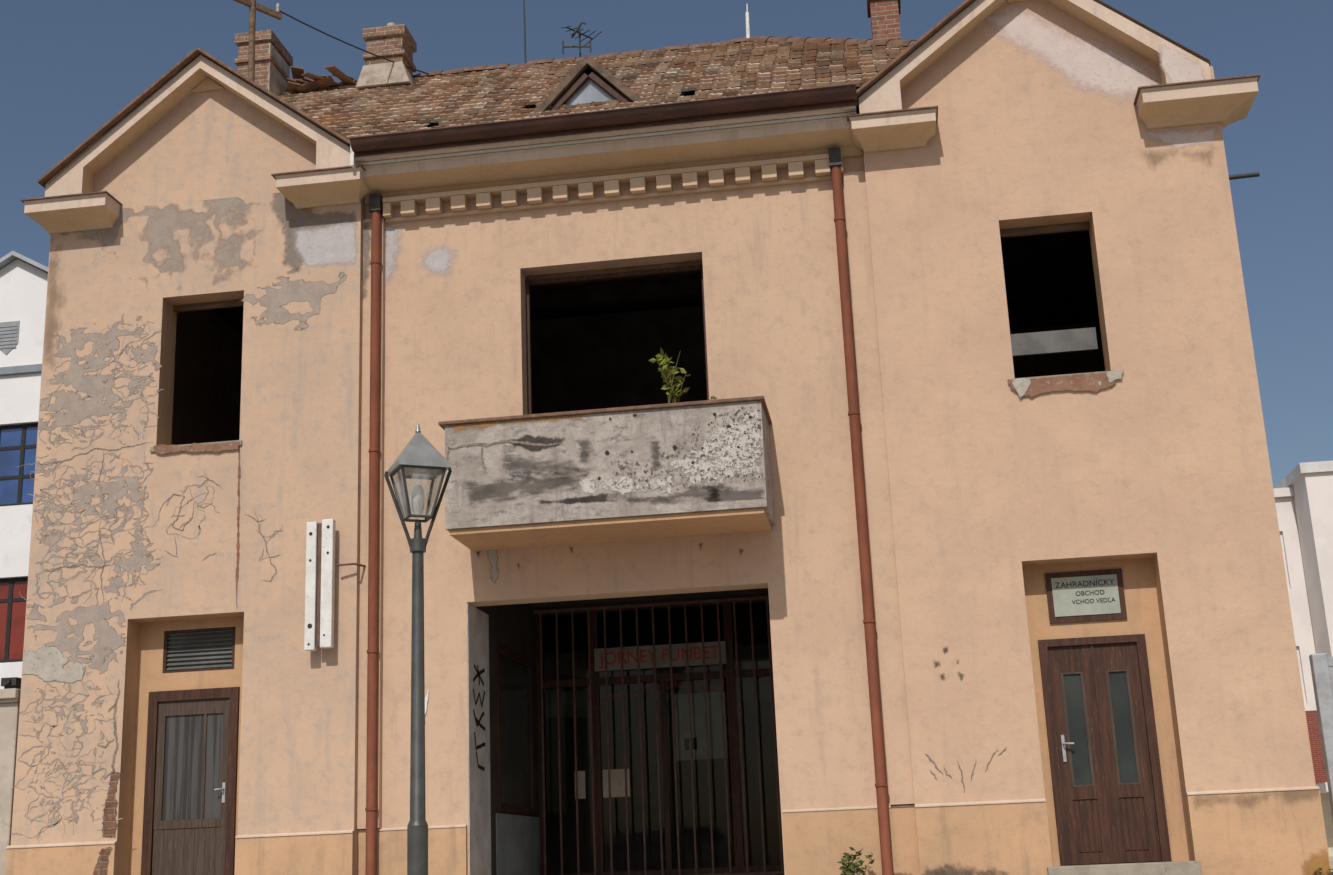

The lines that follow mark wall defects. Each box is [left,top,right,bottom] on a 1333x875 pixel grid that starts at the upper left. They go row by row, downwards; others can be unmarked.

flaking render [81,197,255,283]
flaking render [241,268,347,331]
crack [19,321,283,605]
flaking render [512,435,564,451]
peeling [579,406,763,499]
flaking render [22,314,240,875]